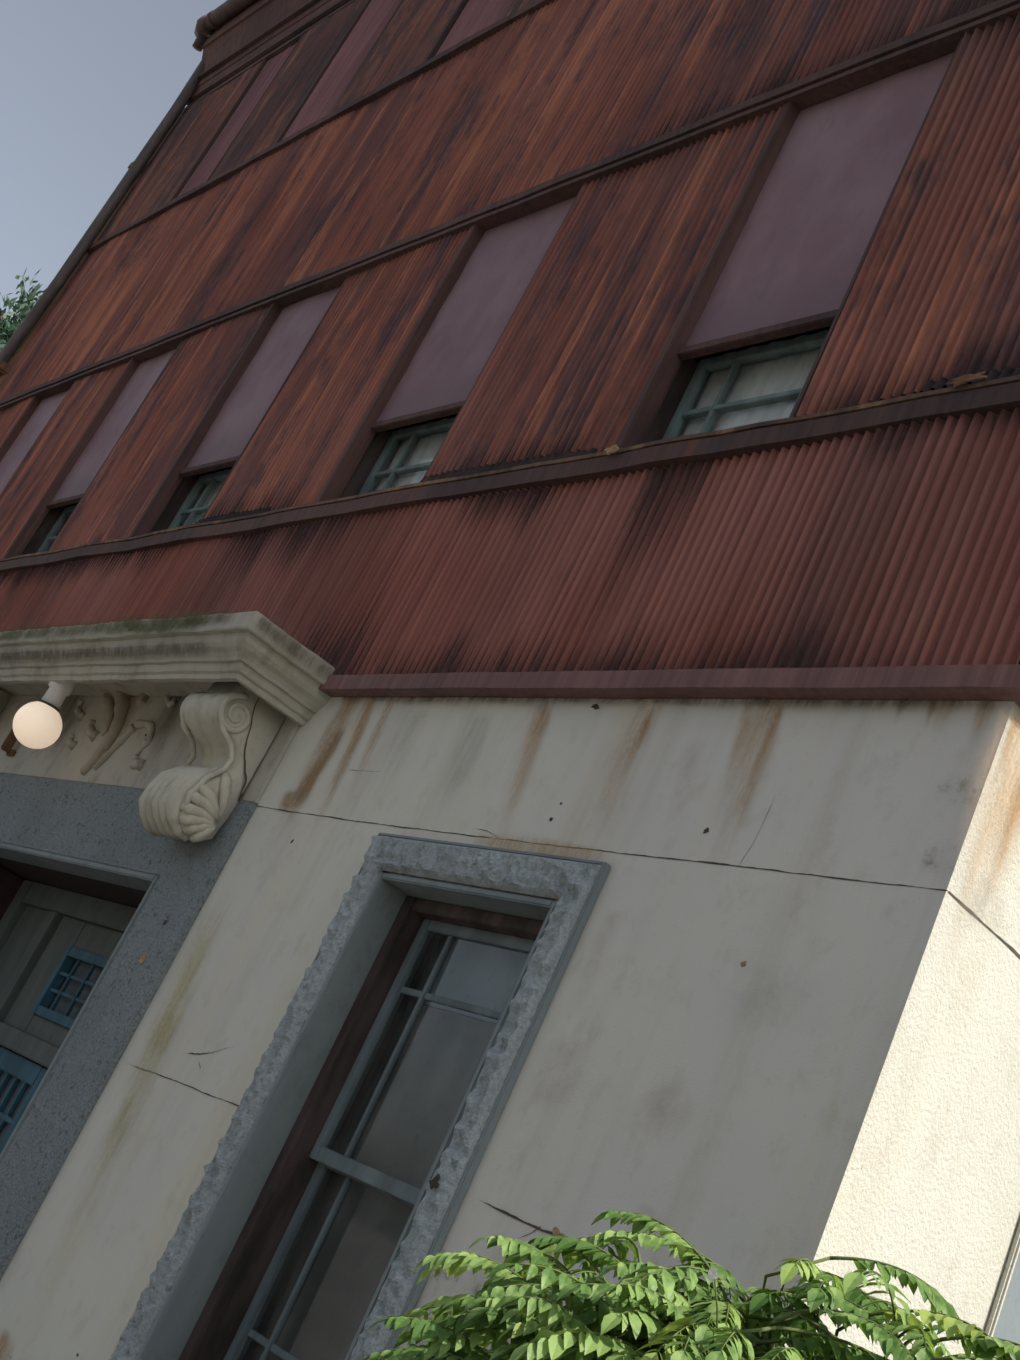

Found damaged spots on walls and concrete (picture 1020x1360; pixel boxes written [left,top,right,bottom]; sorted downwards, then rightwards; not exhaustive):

rust [283,699,372,807]
crack [132,1048,239,1106]
crack [480,1200,565,1245]